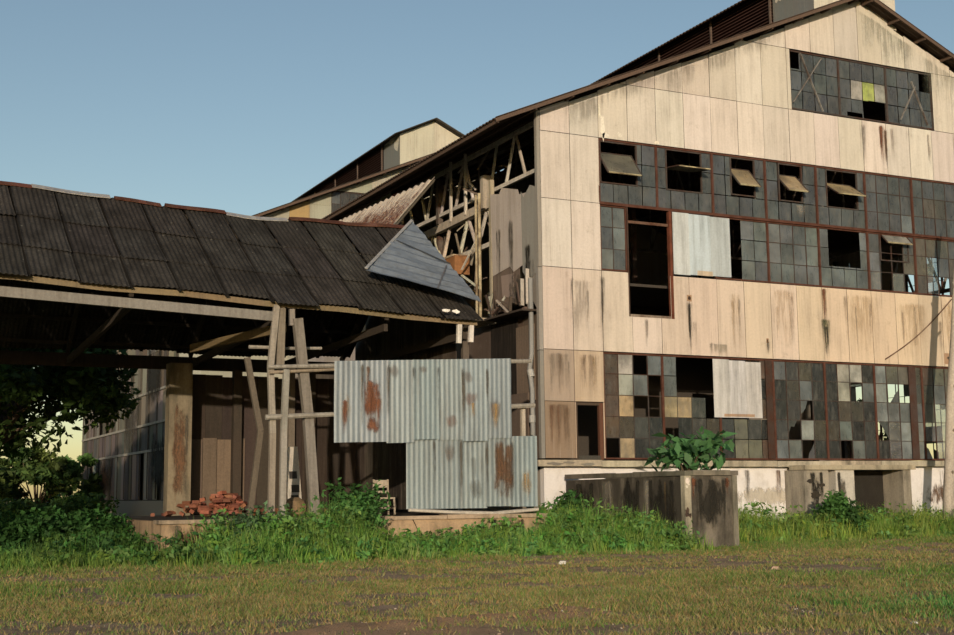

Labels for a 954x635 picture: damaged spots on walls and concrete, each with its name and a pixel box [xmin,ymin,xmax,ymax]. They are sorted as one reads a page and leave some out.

rust [361,365,390,432]
rust [485,443,529,494]
water stain [623,480,676,525]
water stain [695,479,726,524]
water stain [738,470,786,504]
water stain [810,472,823,506]
water stain [928,479,943,502]